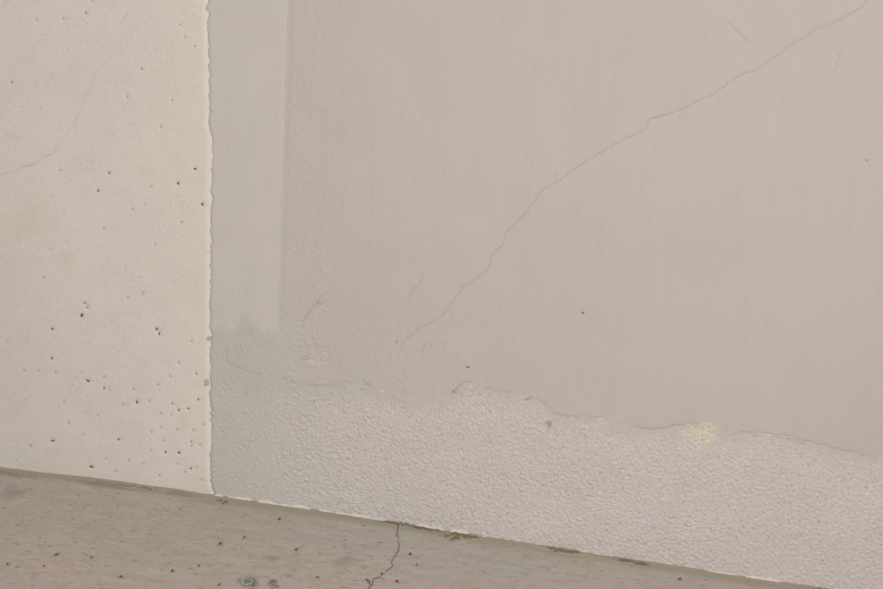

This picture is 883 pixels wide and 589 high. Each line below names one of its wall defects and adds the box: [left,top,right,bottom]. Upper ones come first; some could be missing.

crack [400,0,868,349]
peeling [214,494,384,521]
peeling [417,523,470,534]
crack [365,521,478,589]
crack [547,545,580,553]
crack [617,558,651,566]
peeling [706,570,781,582]